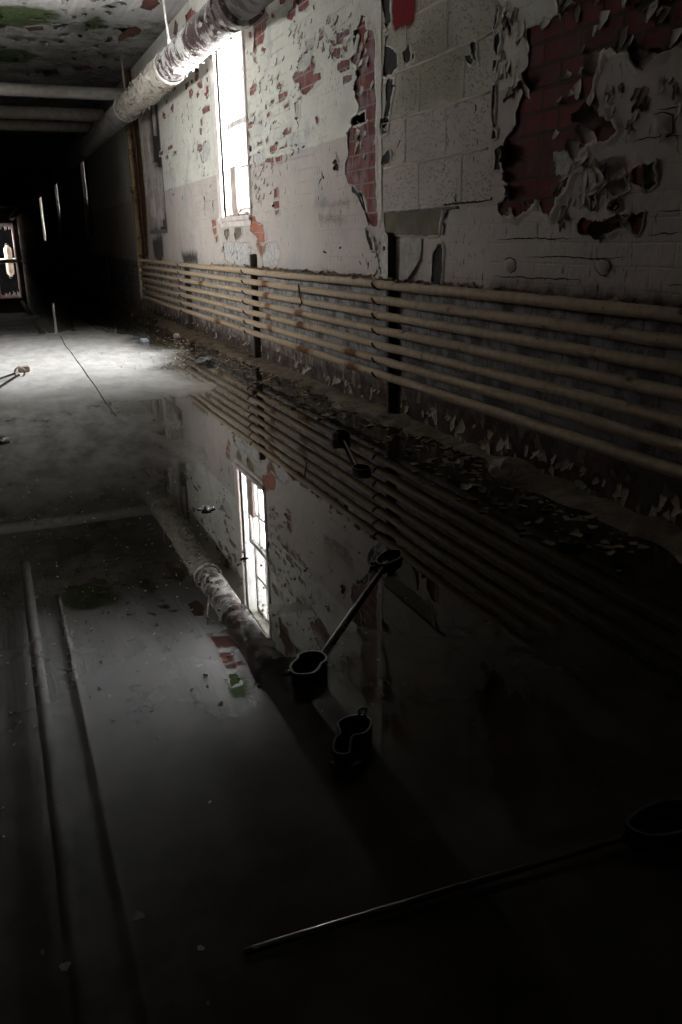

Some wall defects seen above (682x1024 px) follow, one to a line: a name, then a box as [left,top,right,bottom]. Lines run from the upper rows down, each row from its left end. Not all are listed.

peeling [0,0,165,77]
peeling [116,0,588,298]
peeling [464,0,682,244]